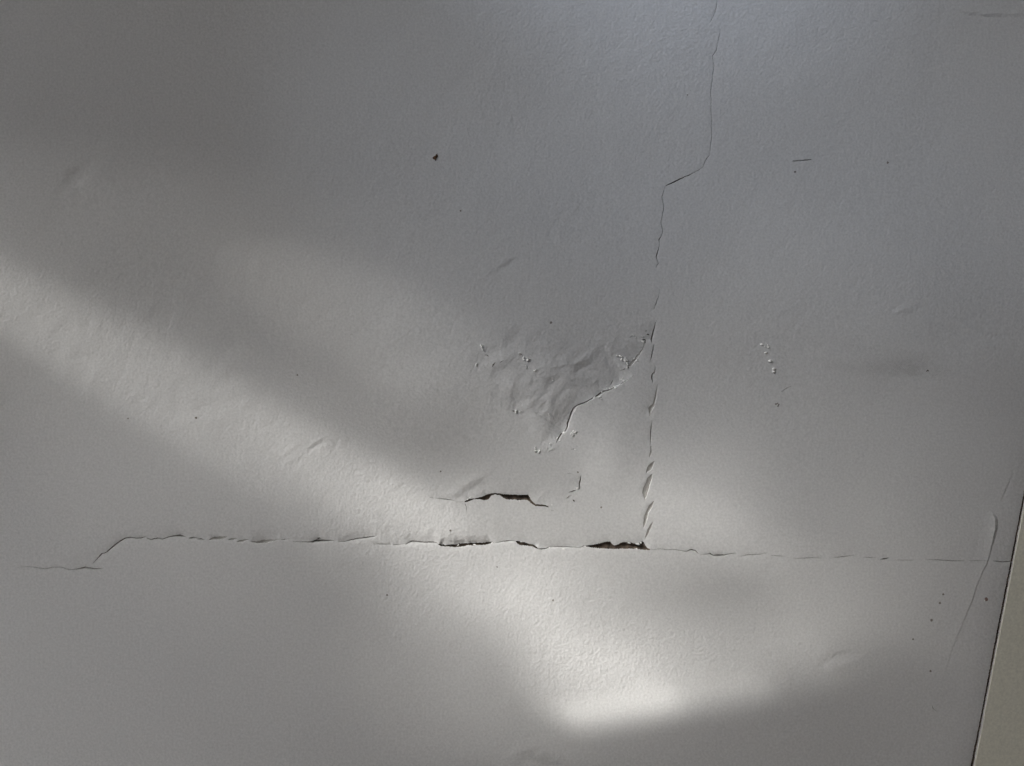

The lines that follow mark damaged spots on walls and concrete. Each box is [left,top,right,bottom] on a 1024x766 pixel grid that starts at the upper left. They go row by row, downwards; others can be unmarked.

crack [27,4,888,570]